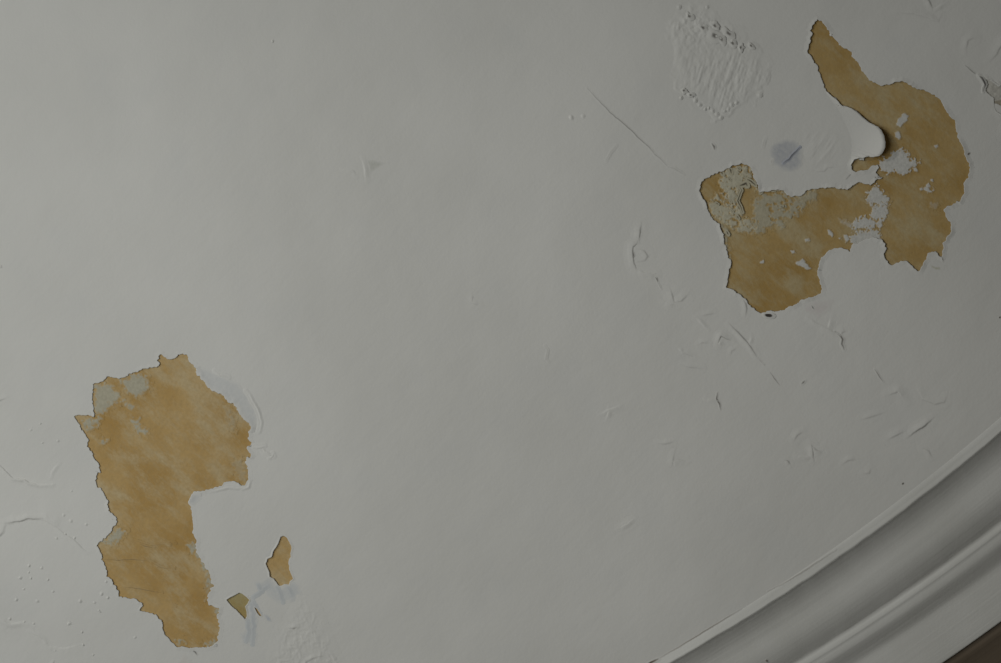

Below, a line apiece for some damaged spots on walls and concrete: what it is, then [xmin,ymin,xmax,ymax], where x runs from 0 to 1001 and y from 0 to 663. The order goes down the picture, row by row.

spalling [685,11,755,53]
peeling [695,15,974,318]
peeling [70,350,277,652]
peeling [264,534,295,588]